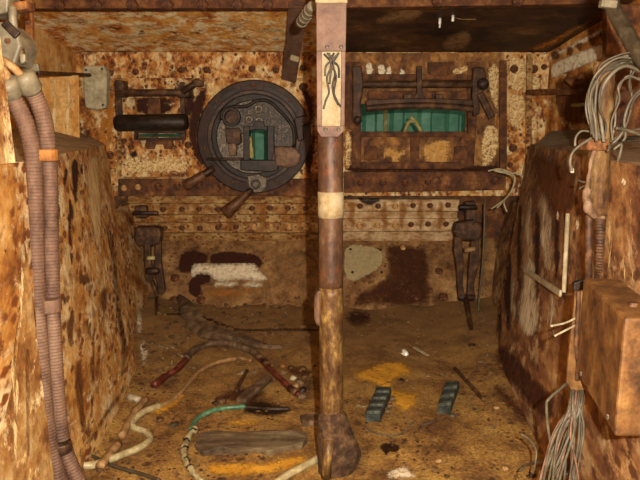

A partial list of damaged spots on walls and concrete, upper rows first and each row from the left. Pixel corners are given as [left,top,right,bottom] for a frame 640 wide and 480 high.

corrosion [136,96,172,114]
corrosion [185,86,207,165]
corrosion [302,91,315,174]
corrosion [63,159,83,240]
corrosion [533,155,578,214]
corrosion [67,308,75,345]
corrosion [111,238,126,367]
corrosion [76,361,86,427]